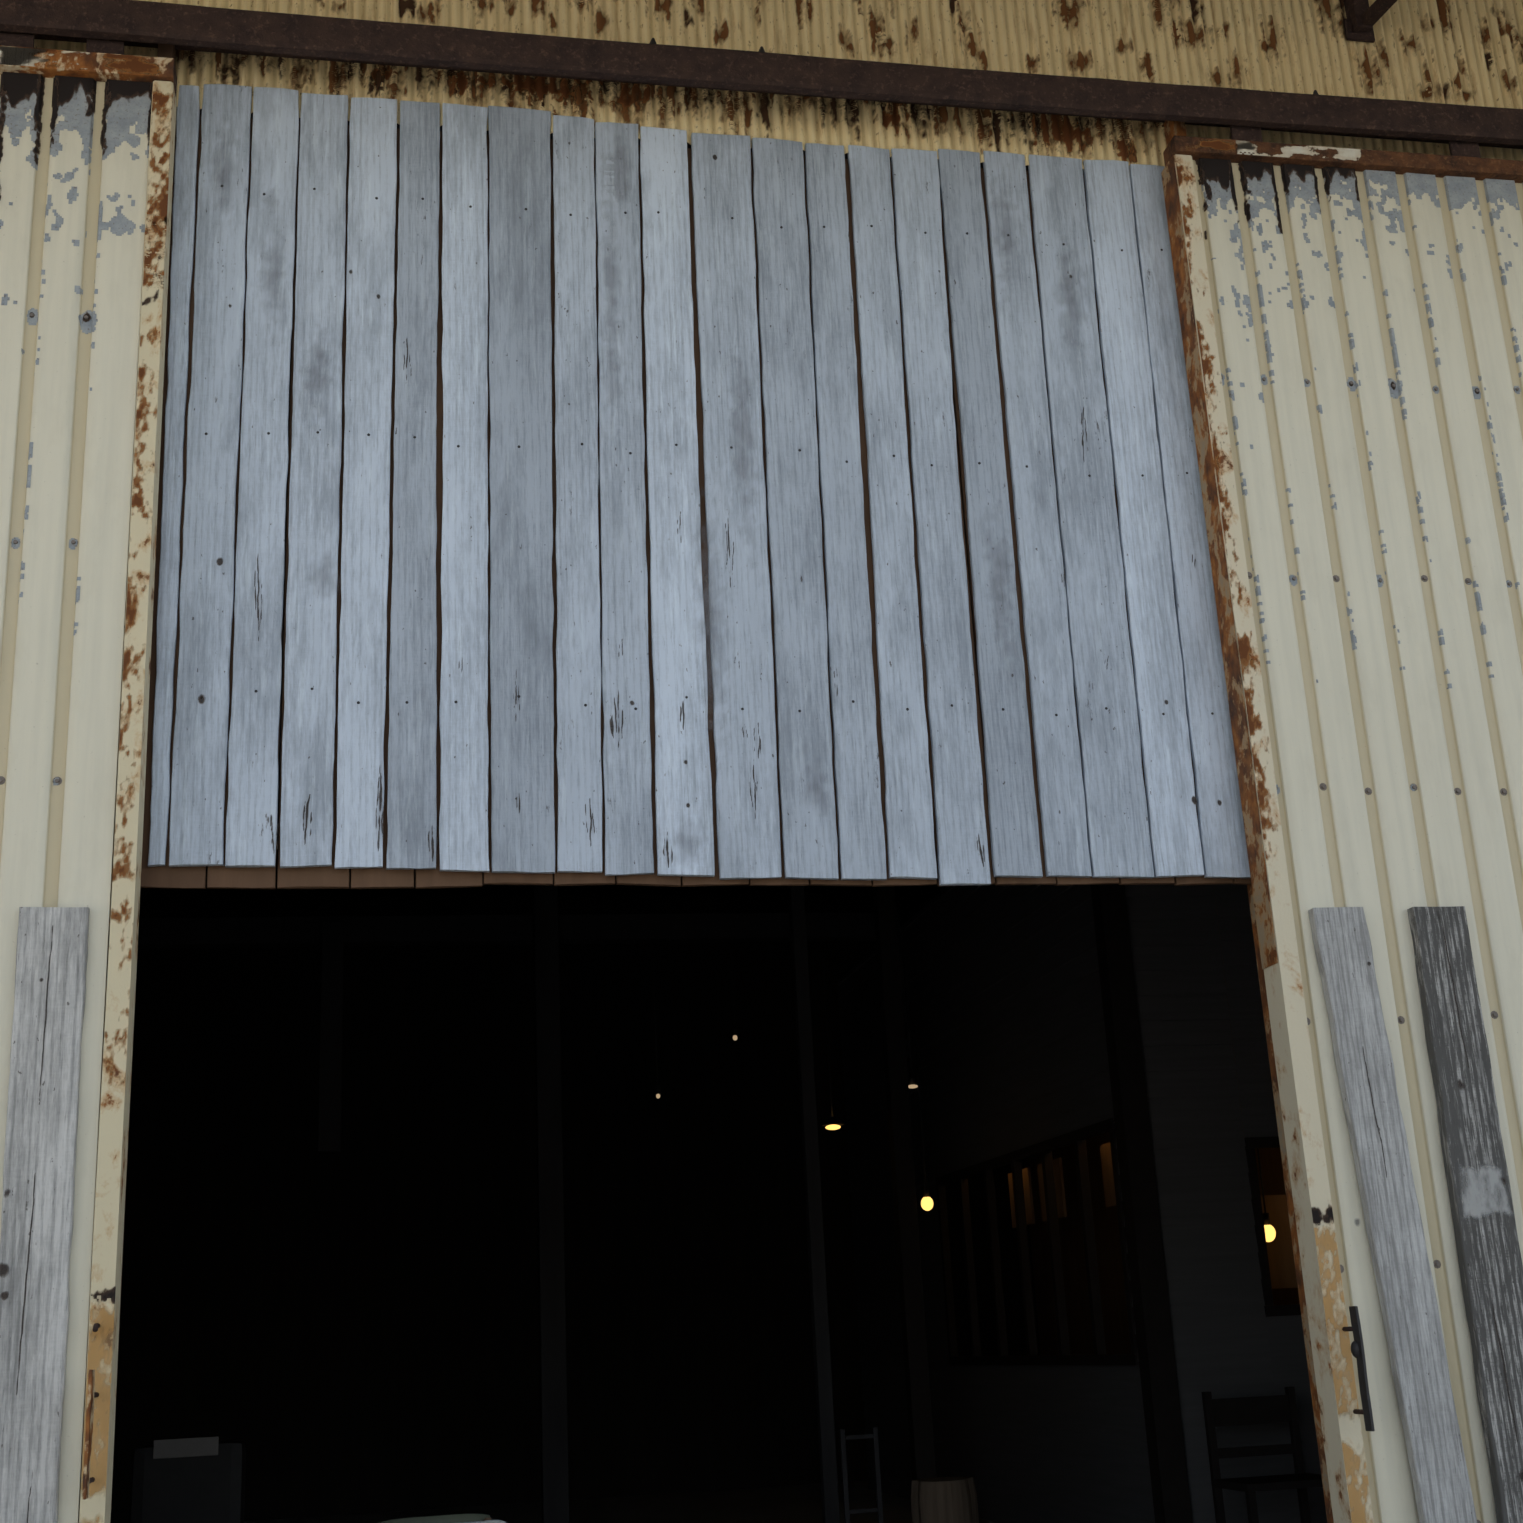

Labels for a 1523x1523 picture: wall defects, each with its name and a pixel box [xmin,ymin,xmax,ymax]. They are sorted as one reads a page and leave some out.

peeling [1,269,46,365]
peeling [0,46,151,258]
peeling [74,281,98,349]
rust [0,46,173,306]
rust [176,50,1165,163]
rust [1176,140,1360,295]
peeling [1201,140,1520,449]
peeling [11,442,33,602]
rust [132,364,157,518]
peeling [1472,376,1509,523]
rust [119,553,145,766]
rust [1237,631,1274,859]